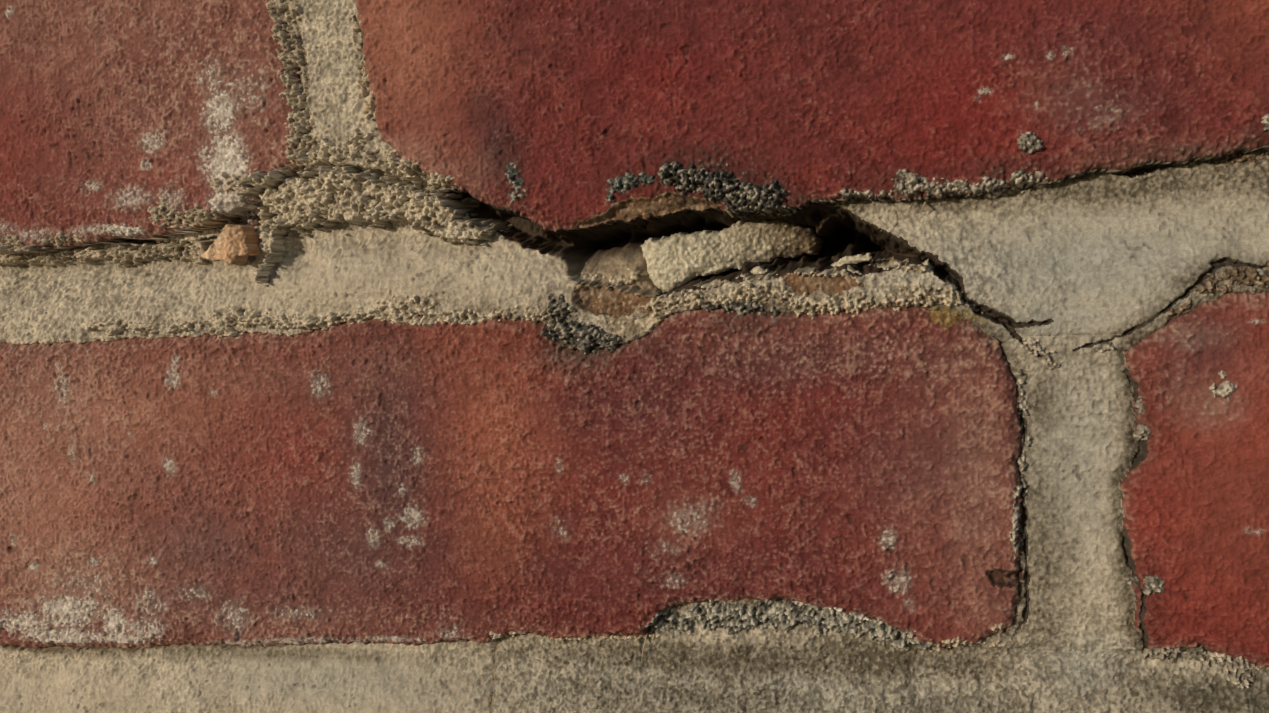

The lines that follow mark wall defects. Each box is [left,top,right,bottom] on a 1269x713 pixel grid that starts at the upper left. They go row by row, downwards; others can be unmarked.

crack [291,18,312,129]
peeling [835,189,899,203]
crack [1111,161,1183,178]
crack [312,162,1054,344]
spalling [693,270,778,311]
peeling [758,256,985,319]
crack [1073,257,1269,352]
crack [1122,370,1139,409]
crack [1019,397,1027,446]
crack [1130,439,1148,470]
crack [1011,493,1031,640]
crack [1122,527,1149,649]